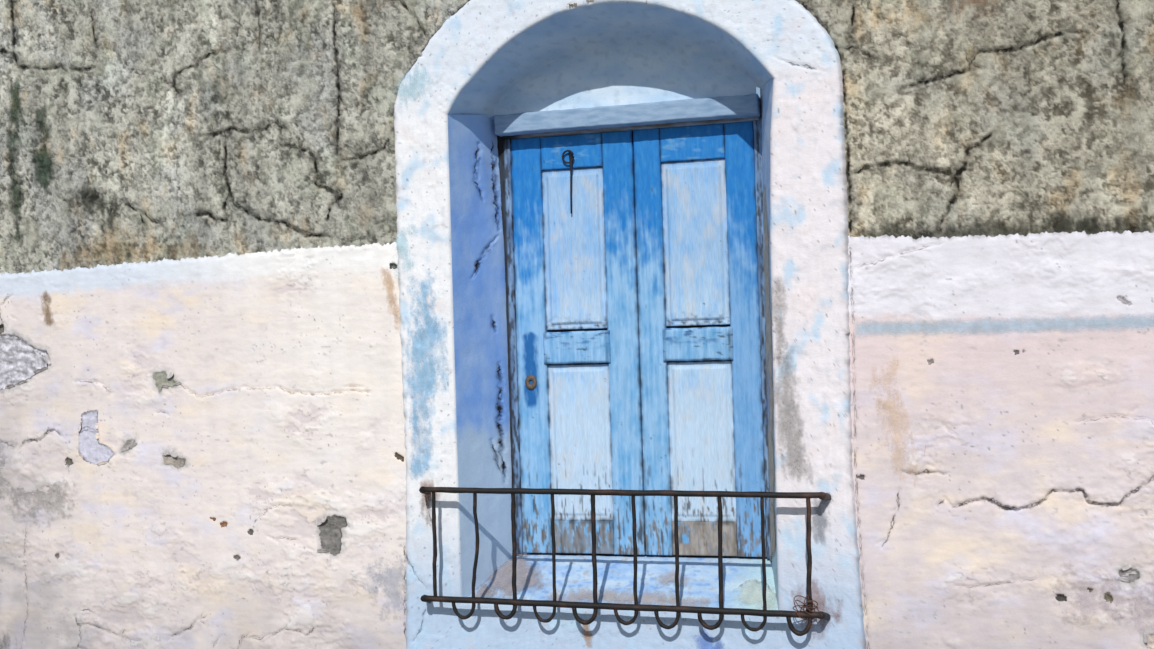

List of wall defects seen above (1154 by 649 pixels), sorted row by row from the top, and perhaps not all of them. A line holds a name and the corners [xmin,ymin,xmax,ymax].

crack [0,0,96,71]
crack [909,31,1080,86]
crack [1114,0,1126,83]
damp [33,106,53,188]
crack [196,10,389,237]
damp [7,132,21,240]
spalling [0,322,52,390]
spalling [152,371,181,392]
peeling [64,410,138,467]
spalling [317,515,347,556]
crack [939,498,1043,510]
spalling [1118,565,1140,583]